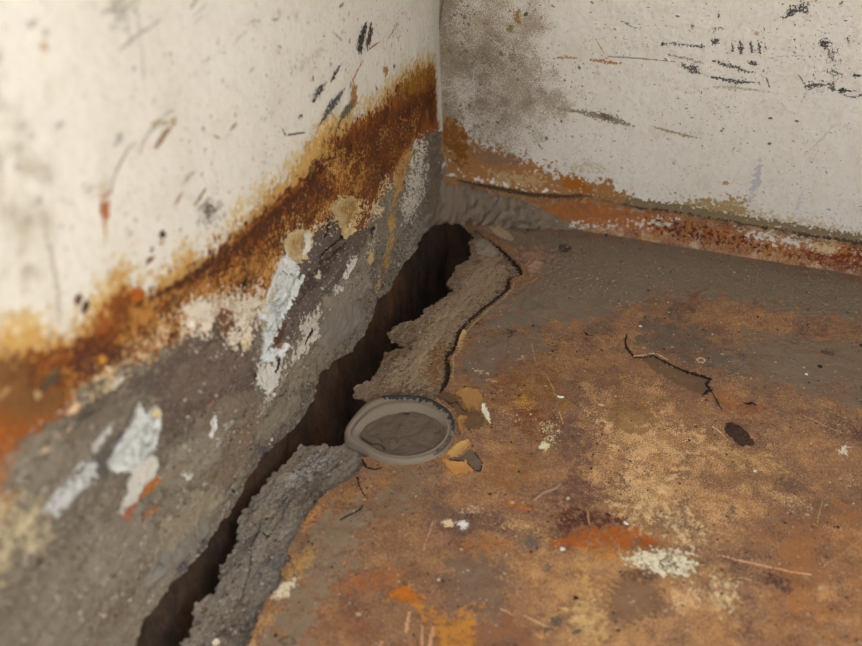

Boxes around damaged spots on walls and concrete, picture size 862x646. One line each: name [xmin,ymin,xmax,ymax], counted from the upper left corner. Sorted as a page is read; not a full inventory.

peeling [652,1,862,202]
crack [319,218,348,262]
crack [254,358,300,404]
spalling [0,0,669,646]
crack [439,231,523,412]
crack [624,334,722,410]
rust [0,375,219,646]
crack [340,436,398,520]
crack [450,453,483,472]
rust [409,361,680,628]
crack [203,522,263,640]
rust [381,575,487,646]